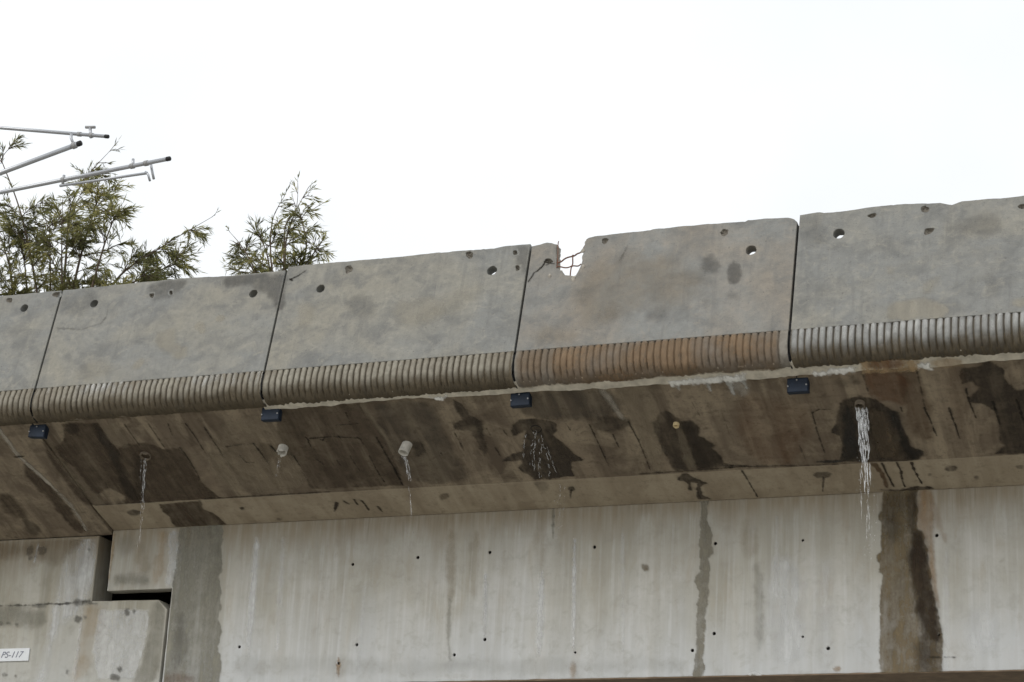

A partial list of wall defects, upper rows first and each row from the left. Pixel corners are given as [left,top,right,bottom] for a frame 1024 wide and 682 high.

spalling [544,241,586,282]
leakage [0,405,409,682]
leakage [504,396,583,493]
leakage [641,412,776,677]
leakage [790,397,943,673]
leakage [960,362,1024,454]